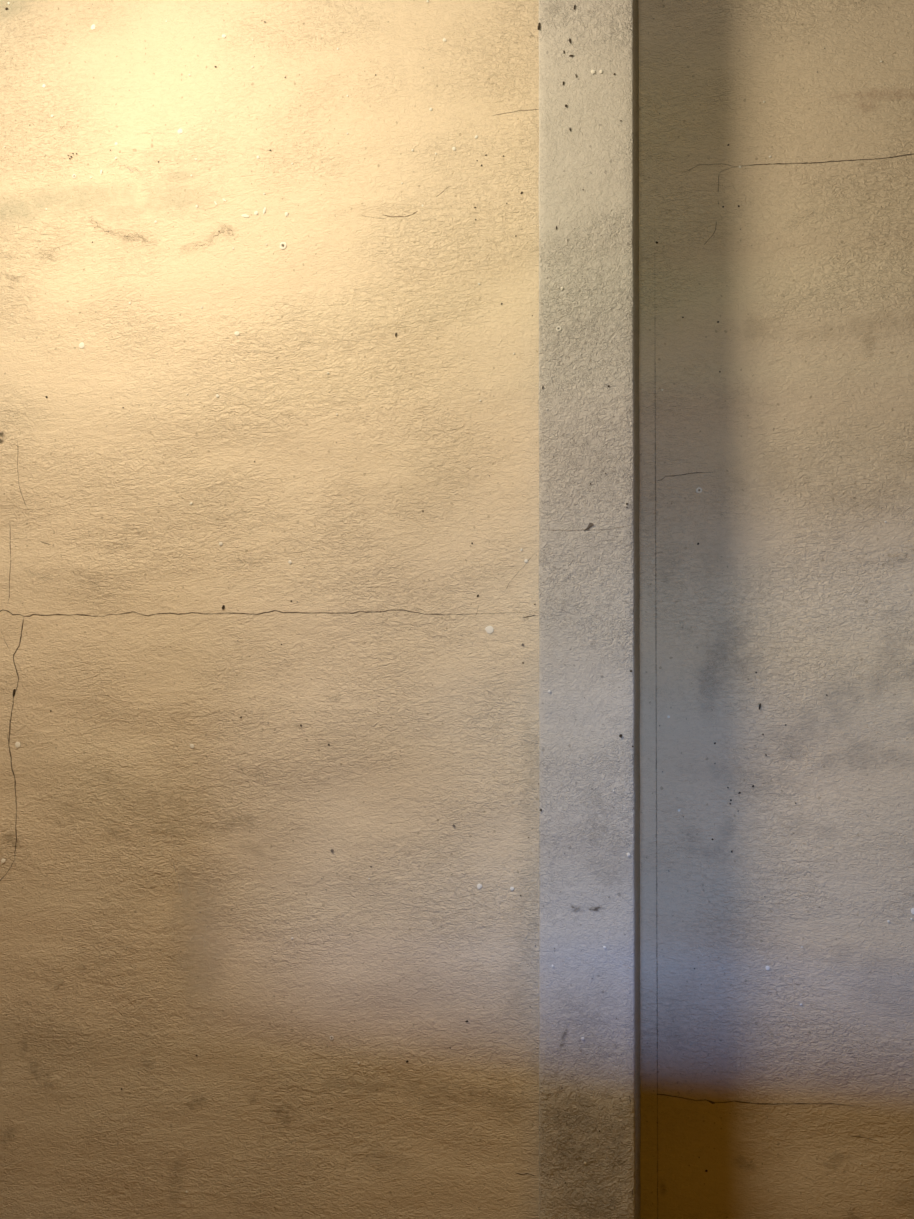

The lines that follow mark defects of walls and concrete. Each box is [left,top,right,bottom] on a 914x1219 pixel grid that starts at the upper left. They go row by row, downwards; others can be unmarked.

crack [703,154,912,240]
crack [0,545,477,881]